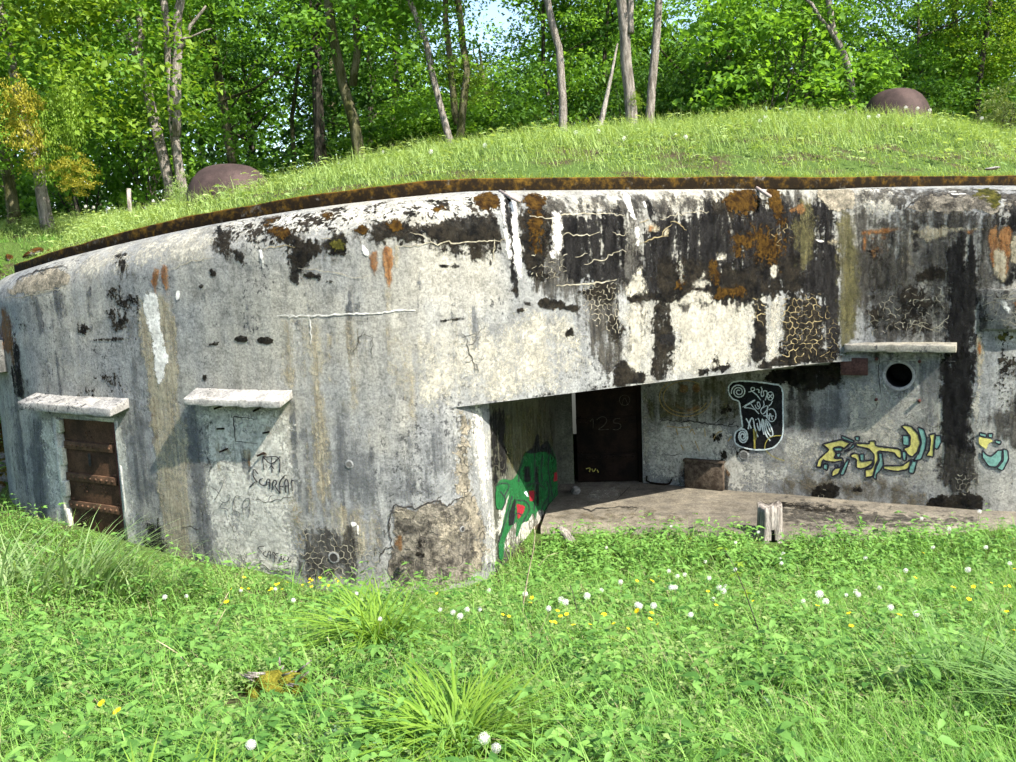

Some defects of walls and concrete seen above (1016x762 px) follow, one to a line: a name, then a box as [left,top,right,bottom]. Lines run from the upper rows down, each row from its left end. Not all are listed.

rust [151,265,168,293]
rust [369,246,393,296]
crack [399,232,507,261]
crack [531,210,709,333]
rust [989,227,1016,282]
crack [277,309,416,354]
crack [751,294,838,363]
water stain [76,187,1016,585]
spalling [388,406,496,591]
spalling [328,552,339,563]